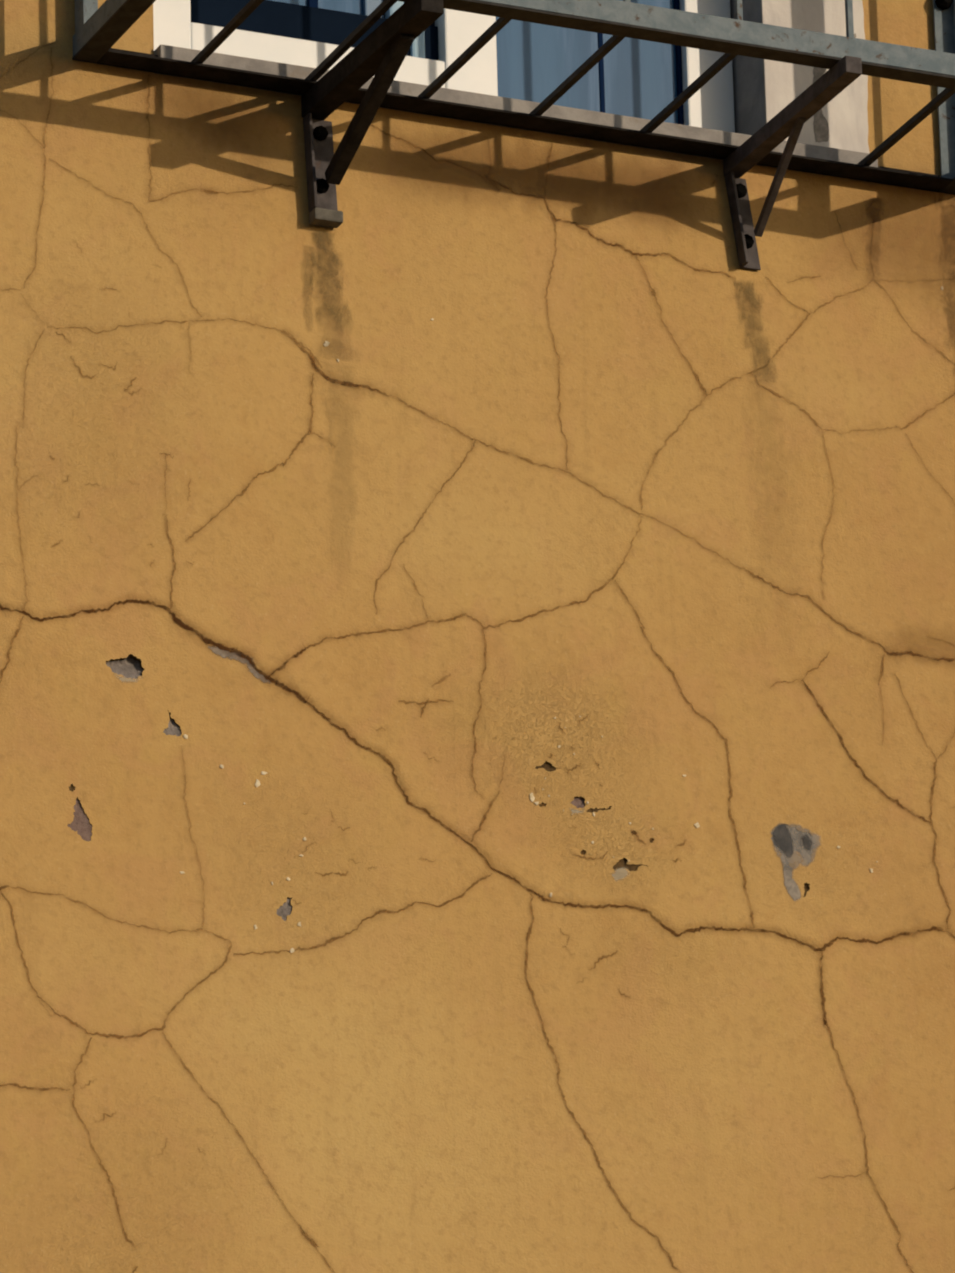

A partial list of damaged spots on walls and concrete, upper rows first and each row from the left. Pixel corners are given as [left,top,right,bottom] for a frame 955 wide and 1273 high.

peeling [813,109,829,142]
crack [372,125,731,277]
spalling [106,654,144,679]
spalling [163,709,188,739]
spalling [530,745,578,807]
spalling [67,784,93,842]
crack [0,347,955,1273]
spalling [563,796,612,816]
spalling [578,841,648,871]
spalling [771,824,820,901]
spalling [277,897,301,926]